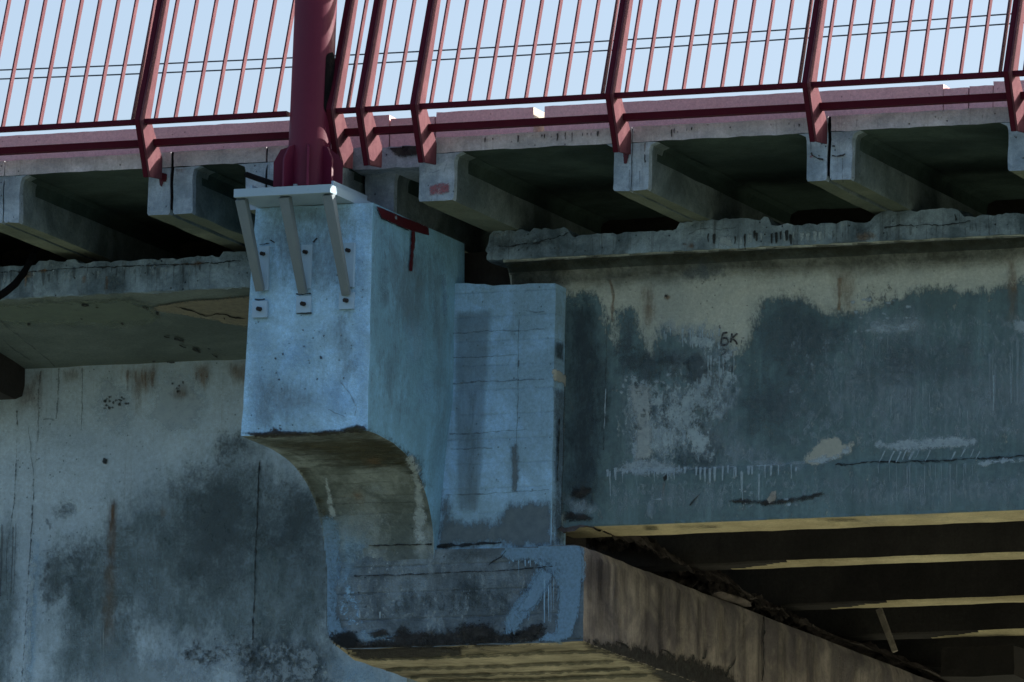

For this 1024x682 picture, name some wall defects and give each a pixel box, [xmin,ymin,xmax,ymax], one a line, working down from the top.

water stain [25,440,336,682]
peeling [321,344,591,657]
water stain [511,230,1024,528]
crack [835,455,1024,466]